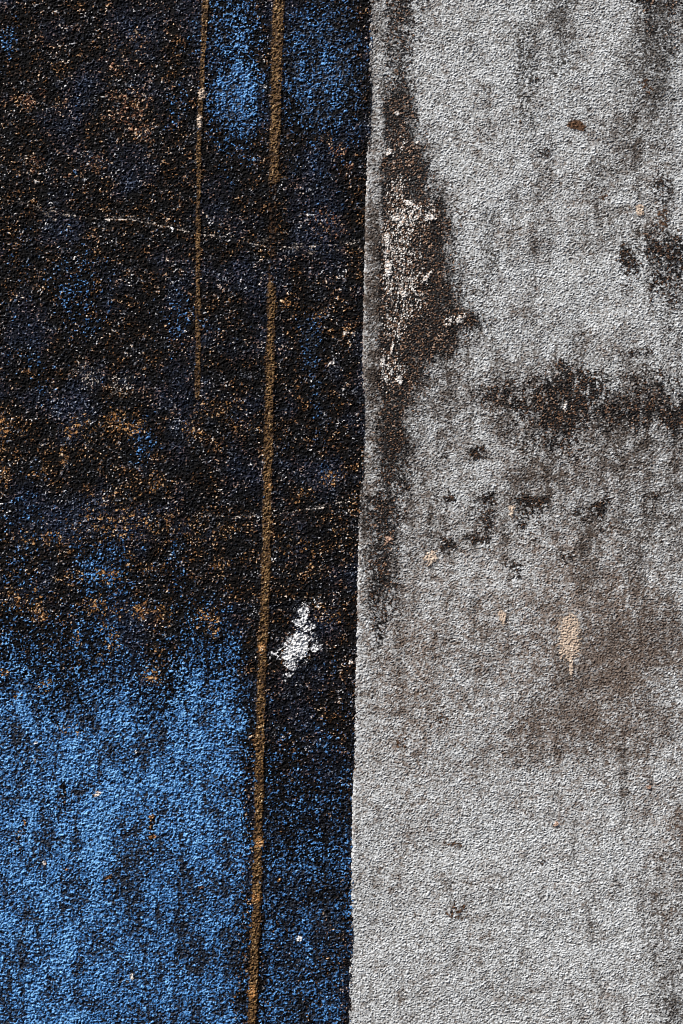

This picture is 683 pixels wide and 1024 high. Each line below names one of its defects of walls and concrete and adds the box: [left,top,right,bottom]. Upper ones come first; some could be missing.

leakage [461,345,683,464]
leakage [0,0,500,1024]
leakage [432,488,551,556]
leakage [570,488,613,542]
peeling [271,596,323,682]